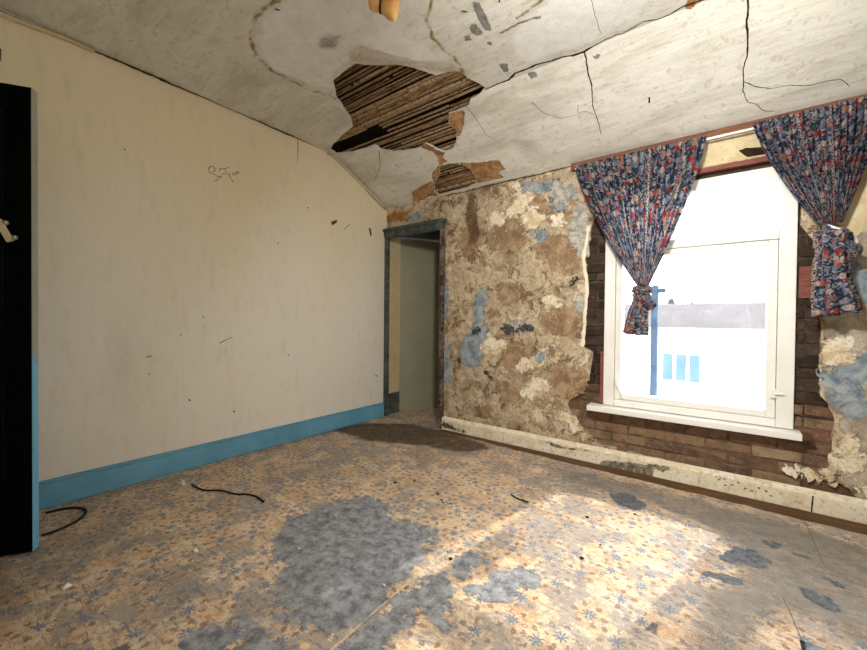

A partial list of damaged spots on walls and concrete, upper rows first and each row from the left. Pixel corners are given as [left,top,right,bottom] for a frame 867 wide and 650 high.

leakage [248,0,471,99]
spalling [333,64,505,202]
crack [485,0,704,133]
peeling [695,131,772,180]
crack [742,0,849,111]
flaking render [458,165,867,498]